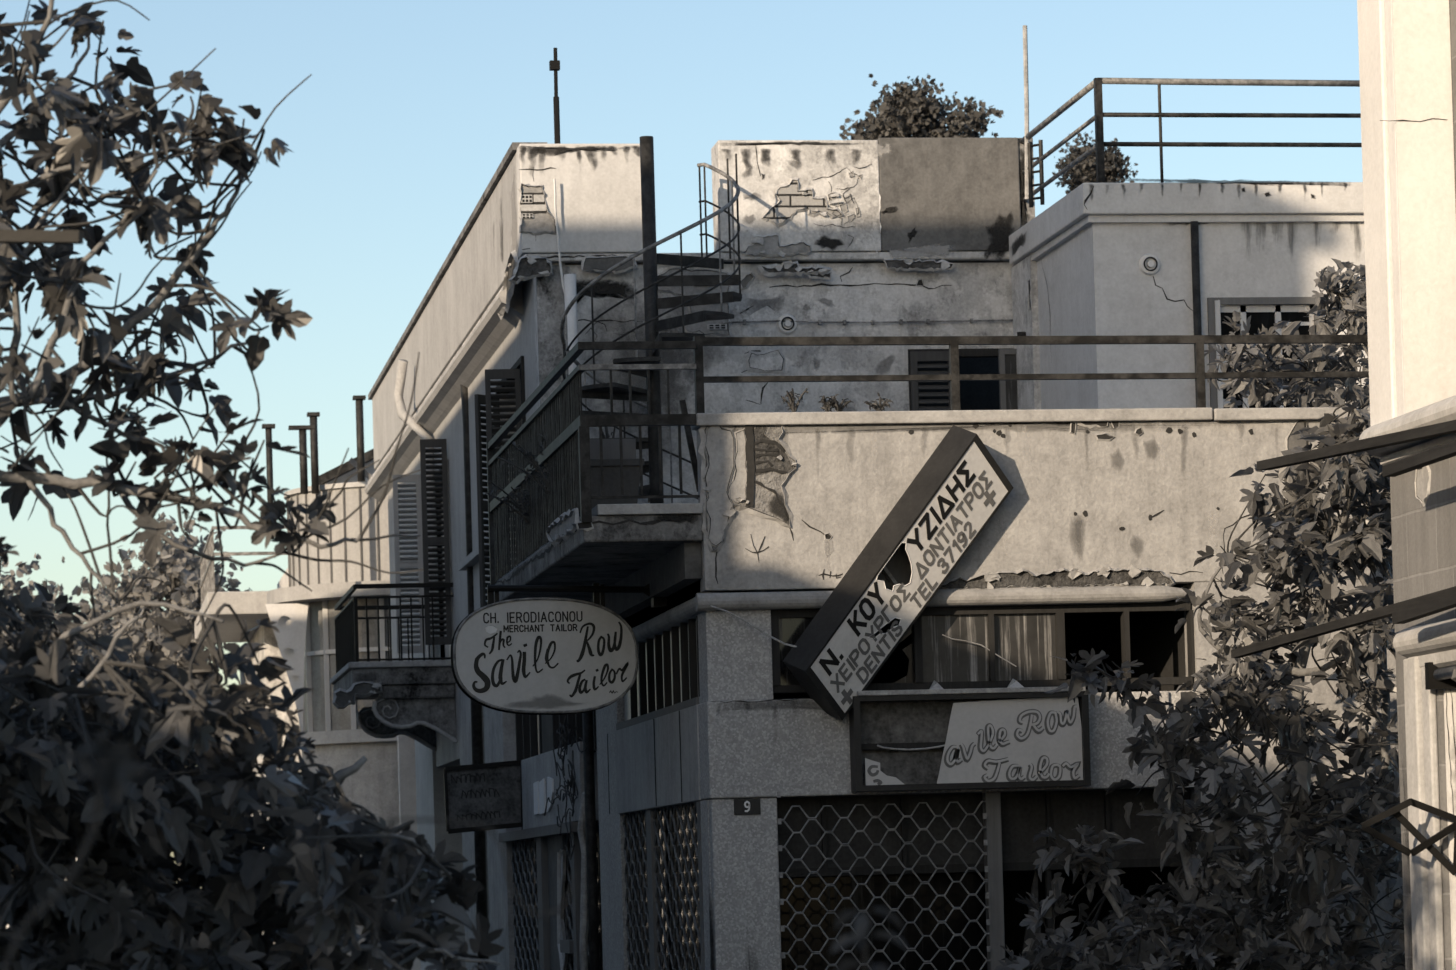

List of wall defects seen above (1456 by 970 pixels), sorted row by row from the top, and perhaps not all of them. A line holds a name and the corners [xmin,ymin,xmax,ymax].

leakage [520,146,640,166]
flaking render [518,182,557,236]
flaking render [498,250,553,320]
flaking render [581,254,638,274]
flaking render [657,177,861,337]
crack [1153,276,1193,311]
flaking render [698,425,797,552]
flaking render [940,564,1175,590]